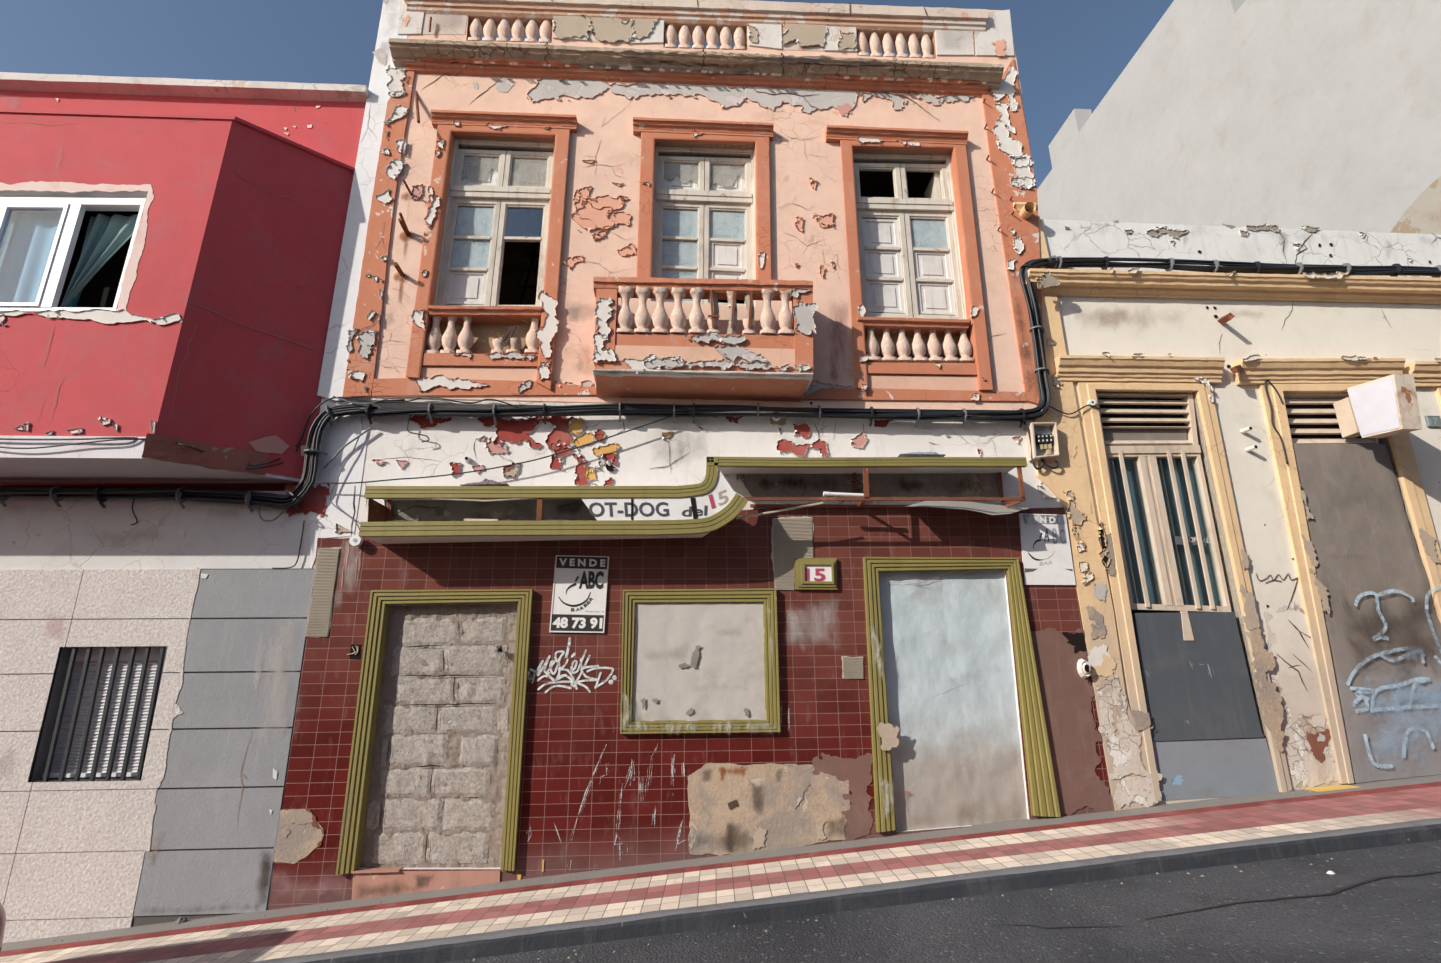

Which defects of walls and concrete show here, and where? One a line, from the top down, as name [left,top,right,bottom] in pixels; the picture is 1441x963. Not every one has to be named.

peeling [372,39,1036,204]
peeling [0,181,182,326]
flaking render [346,254,387,391]
peeling [411,309,426,331]
peeling [412,184,440,228]
peeling [571,182,631,241]
crack [1280,233,1312,263]
peeling [384,415,620,521]
spalling [1030,482,1163,818]
peeling [1239,549,1339,790]
spalling [269,809,324,864]
spalling [687,722,900,856]